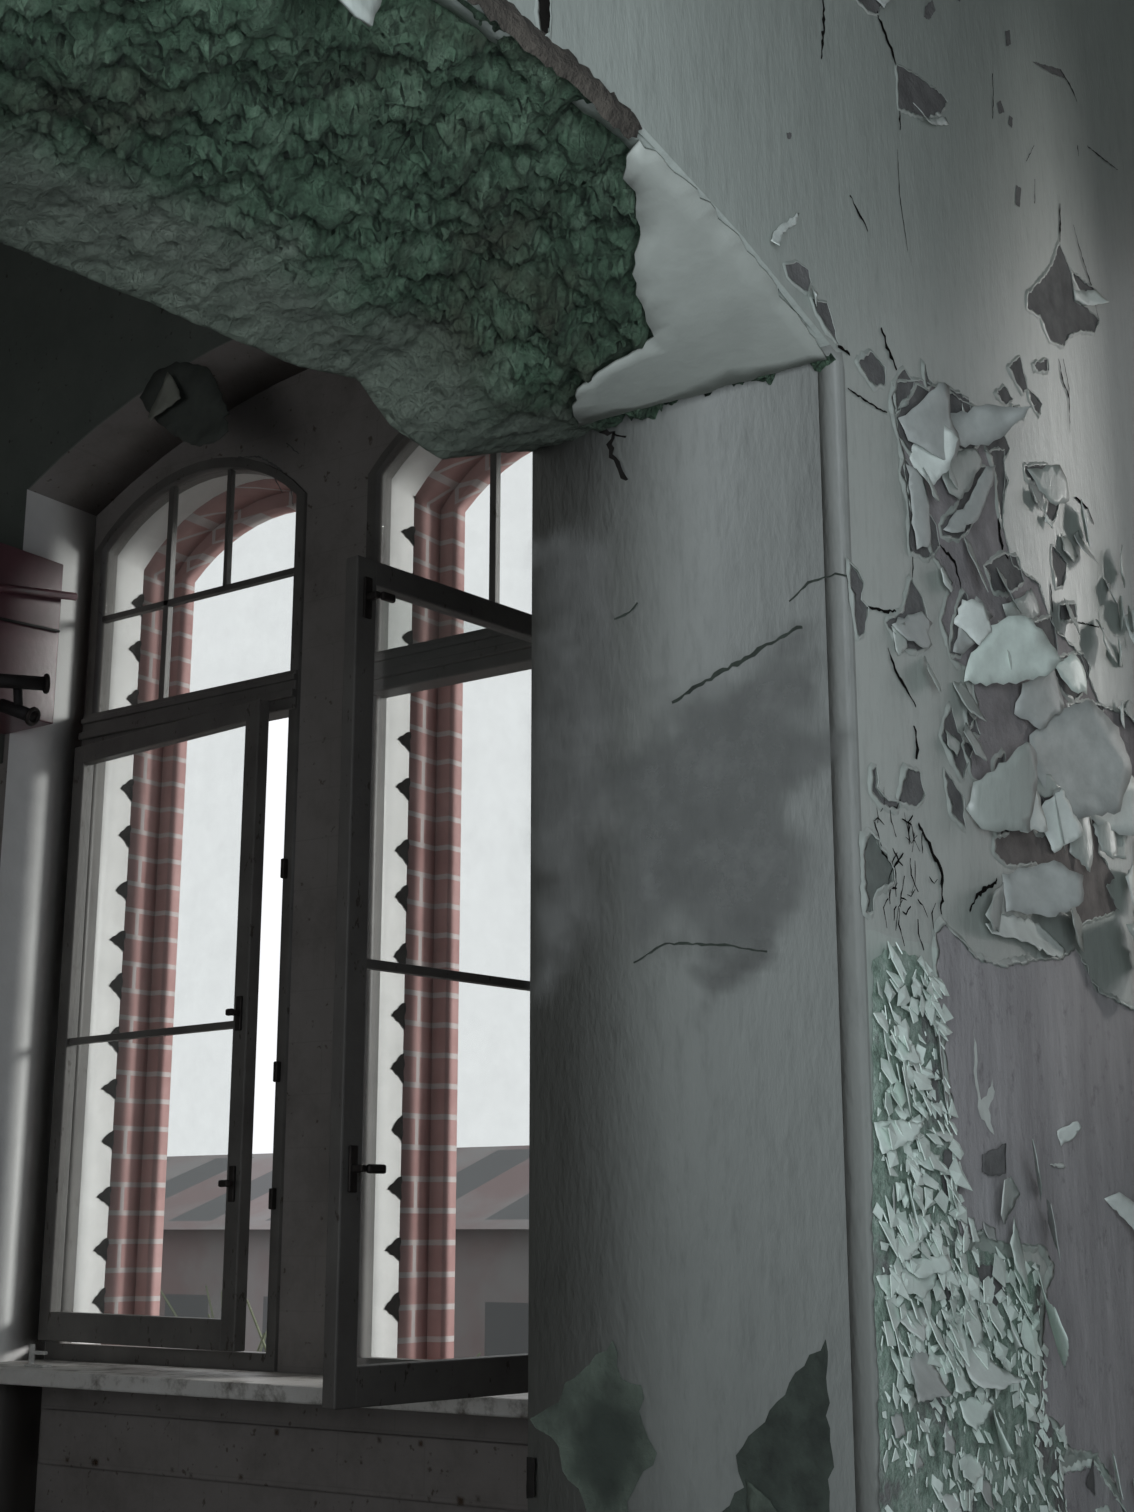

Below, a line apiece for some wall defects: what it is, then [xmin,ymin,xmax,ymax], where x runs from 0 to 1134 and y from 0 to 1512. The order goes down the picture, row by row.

crack [533,0,553,40]
peeling [1034,62,1077,101]
flaking render [0,0,836,459]
peeling [1025,204,1109,420]
peeling [782,259,1134,1512]
peeling [530,1340,657,1512]
peeling [722,1339,834,1512]